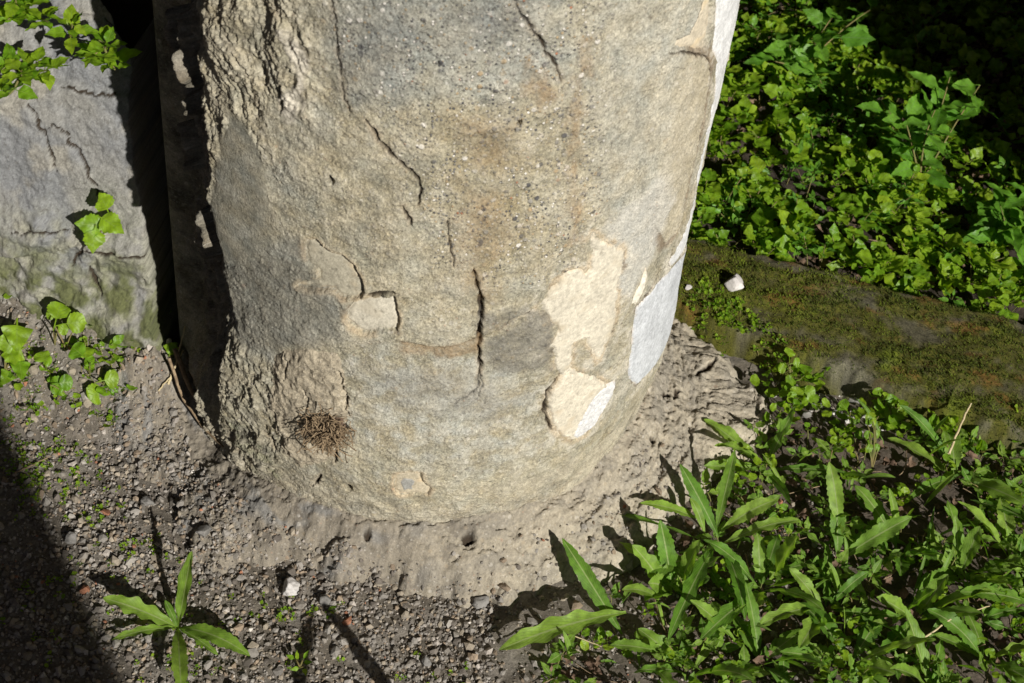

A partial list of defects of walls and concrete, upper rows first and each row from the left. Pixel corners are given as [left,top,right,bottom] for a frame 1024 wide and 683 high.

crack [332,0,351,112]
crack [517,5,561,80]
crack [375,129,423,224]
flaking render [628,0,740,384]
spalling [300,239,399,330]
crack [447,220,483,401]
flaking render [540,233,624,439]